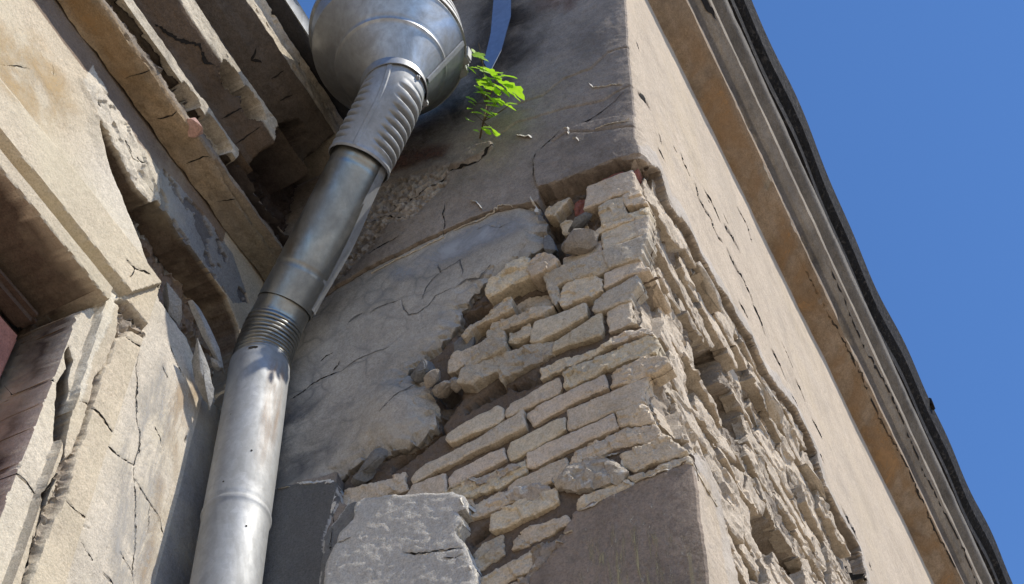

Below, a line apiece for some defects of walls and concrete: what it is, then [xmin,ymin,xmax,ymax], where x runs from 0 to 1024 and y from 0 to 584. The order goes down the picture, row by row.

flaking render [187,117,203,138]
crack [585,93,646,122]
crack [370,144,493,253]
flaking render [131,220,224,410]
crack [348,260,490,323]
crack [292,348,386,399]
flaking render [275,160,853,584]
crack [80,312,187,584]
crack [0,473,85,581]